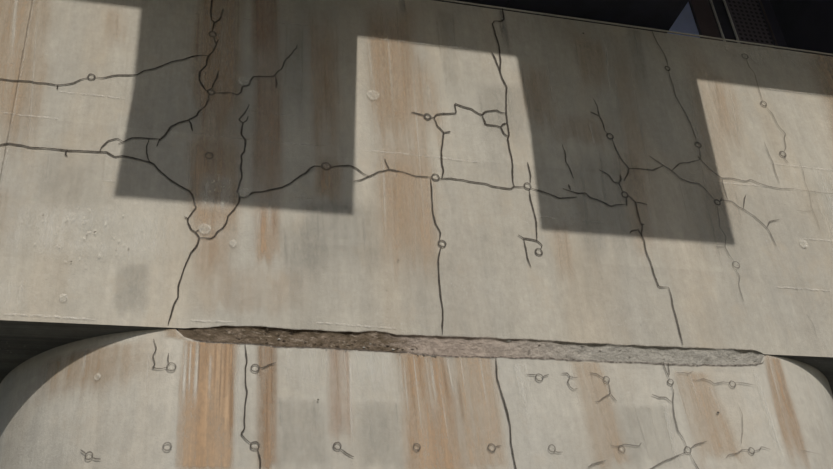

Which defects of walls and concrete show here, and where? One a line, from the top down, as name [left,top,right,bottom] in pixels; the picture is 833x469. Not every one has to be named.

crack [0,0,788,344]
crack [152,339,176,371]
rust [182,341,235,468]
crack [241,345,276,469]
spalling [178,326,764,366]
crack [488,360,517,469]
crack [651,363,706,469]